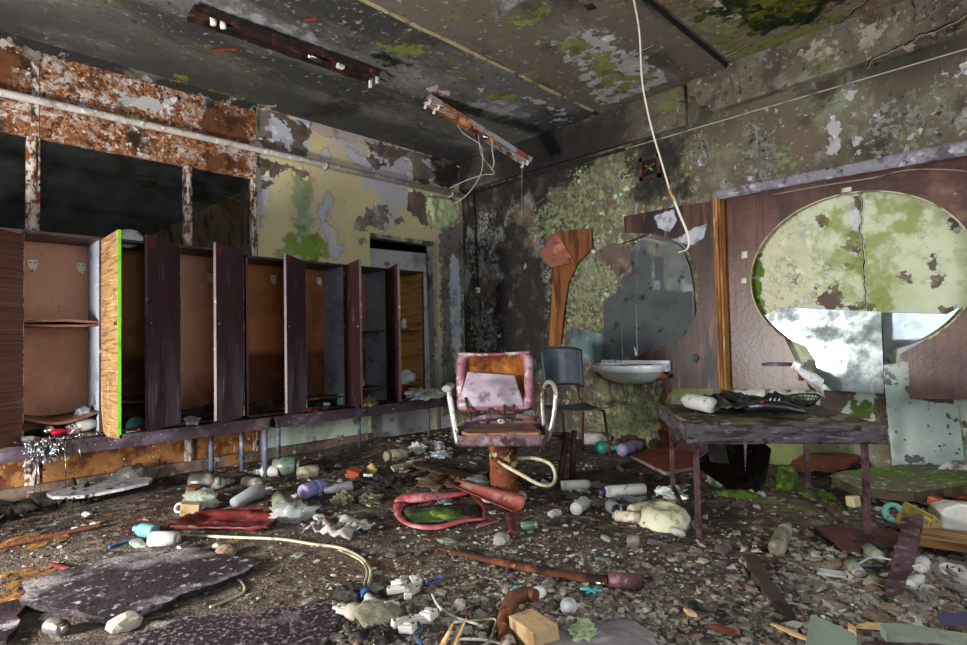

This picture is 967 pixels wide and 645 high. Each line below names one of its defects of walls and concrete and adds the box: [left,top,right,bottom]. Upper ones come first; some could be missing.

crack [838,0,967,69]
corrosion [0,46,26,89]
corrosion [197,107,254,144]
corrosion [202,150,250,173]
damp [431,156,459,186]
damp [464,157,593,381]